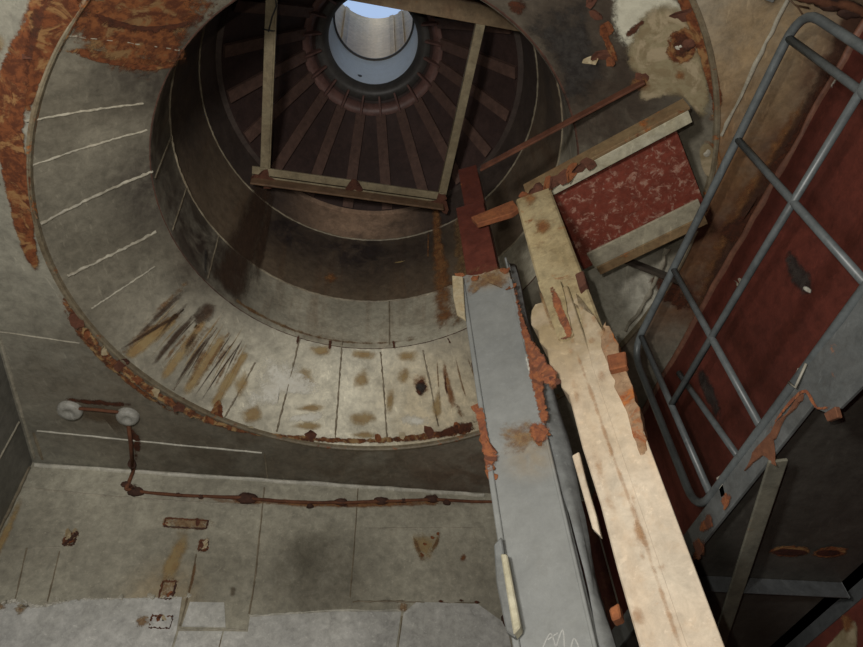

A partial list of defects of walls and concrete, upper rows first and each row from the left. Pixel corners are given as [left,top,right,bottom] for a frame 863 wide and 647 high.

peeling [582,0,722,117]
rust [814,0,863,20]
rust [0,0,218,269]
damp [237,359,317,421]
rust [63,296,498,480]
damp [289,405,322,429]
damp [352,414,374,437]
rust [427,210,561,449]